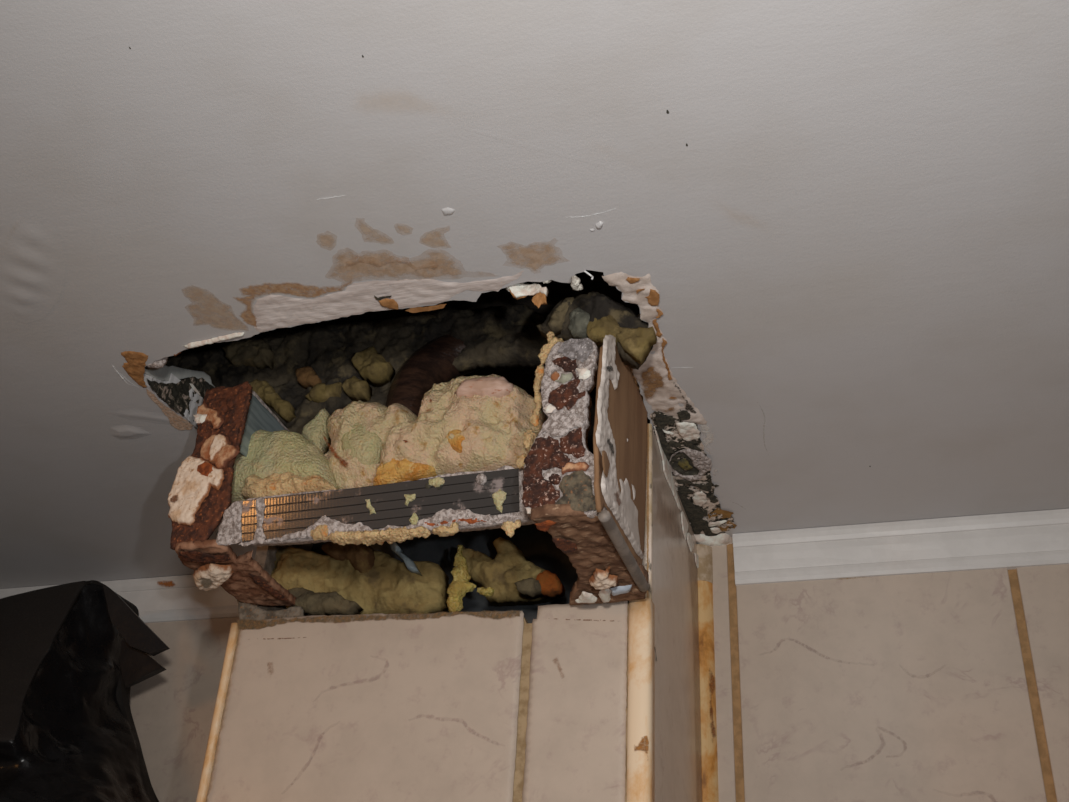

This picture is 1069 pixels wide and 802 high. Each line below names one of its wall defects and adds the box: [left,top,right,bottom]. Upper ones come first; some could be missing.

peeling [509,283,549,308]
flaking render [147,332,245,369]
flaking render [602,272,707,425]
corrosion [548,356,586,410]
corrosion [193,382,248,446]
corrosion [197,461,213,476]
corrosion [522,427,596,512]
flaking render [602,450,610,477]
flaking render [654,426,733,568]
corrosion [535,520,578,554]
corrosion [178,551,231,563]
flaking render [575,566,632,603]